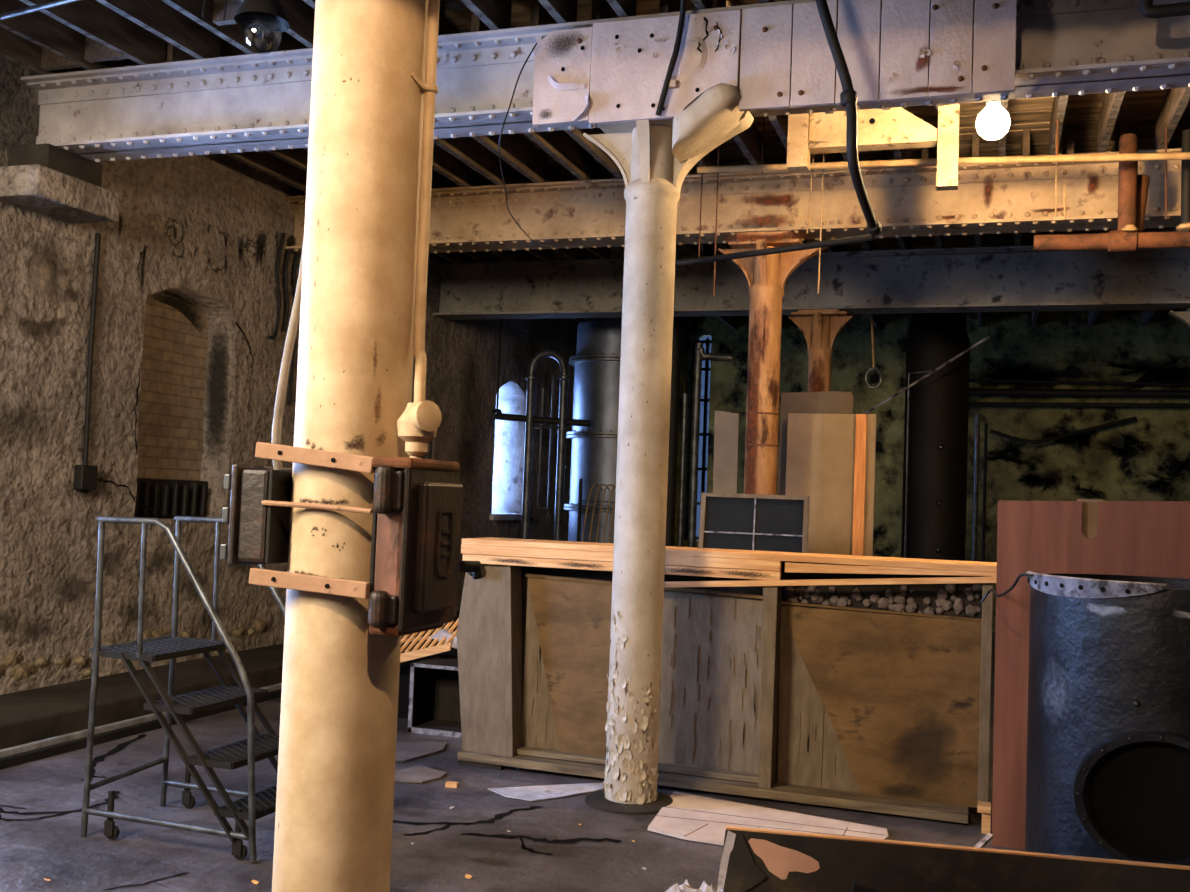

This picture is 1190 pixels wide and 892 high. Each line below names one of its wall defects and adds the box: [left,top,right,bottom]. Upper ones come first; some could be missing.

corrosion [916,48,928,70]
corrosion [984,181,992,204]
corrosion [1088,175,1098,193]
corrosion [735,195,794,242]
corrosion [745,323,765,494]
peeling [603,611,662,805]
crack [393,806,622,855]